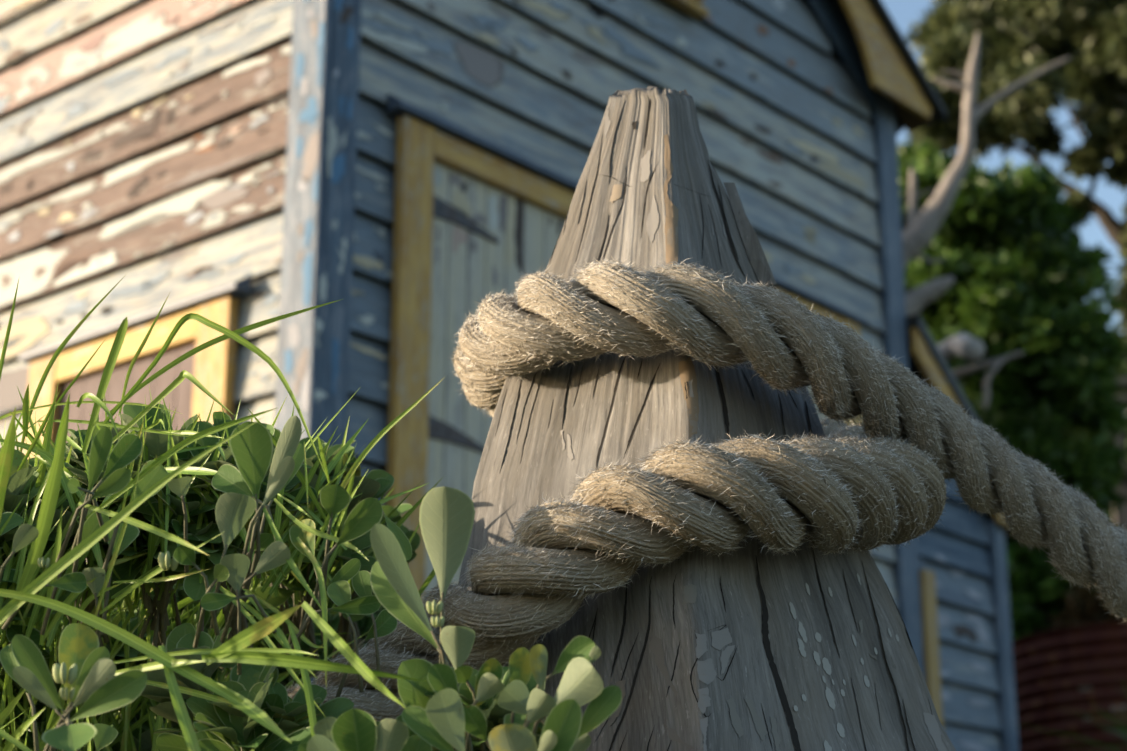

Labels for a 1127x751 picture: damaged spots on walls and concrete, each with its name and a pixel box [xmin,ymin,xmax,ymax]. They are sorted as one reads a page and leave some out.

peeling [0,13,181,101]
peeling [220,44,291,98]
peeling [361,10,428,53]
peeling [0,101,179,184]
peeling [0,127,222,242]
peeling [249,101,289,131]
peeling [0,158,286,307]
crack [589,557,801,751]
crack [813,551,932,751]